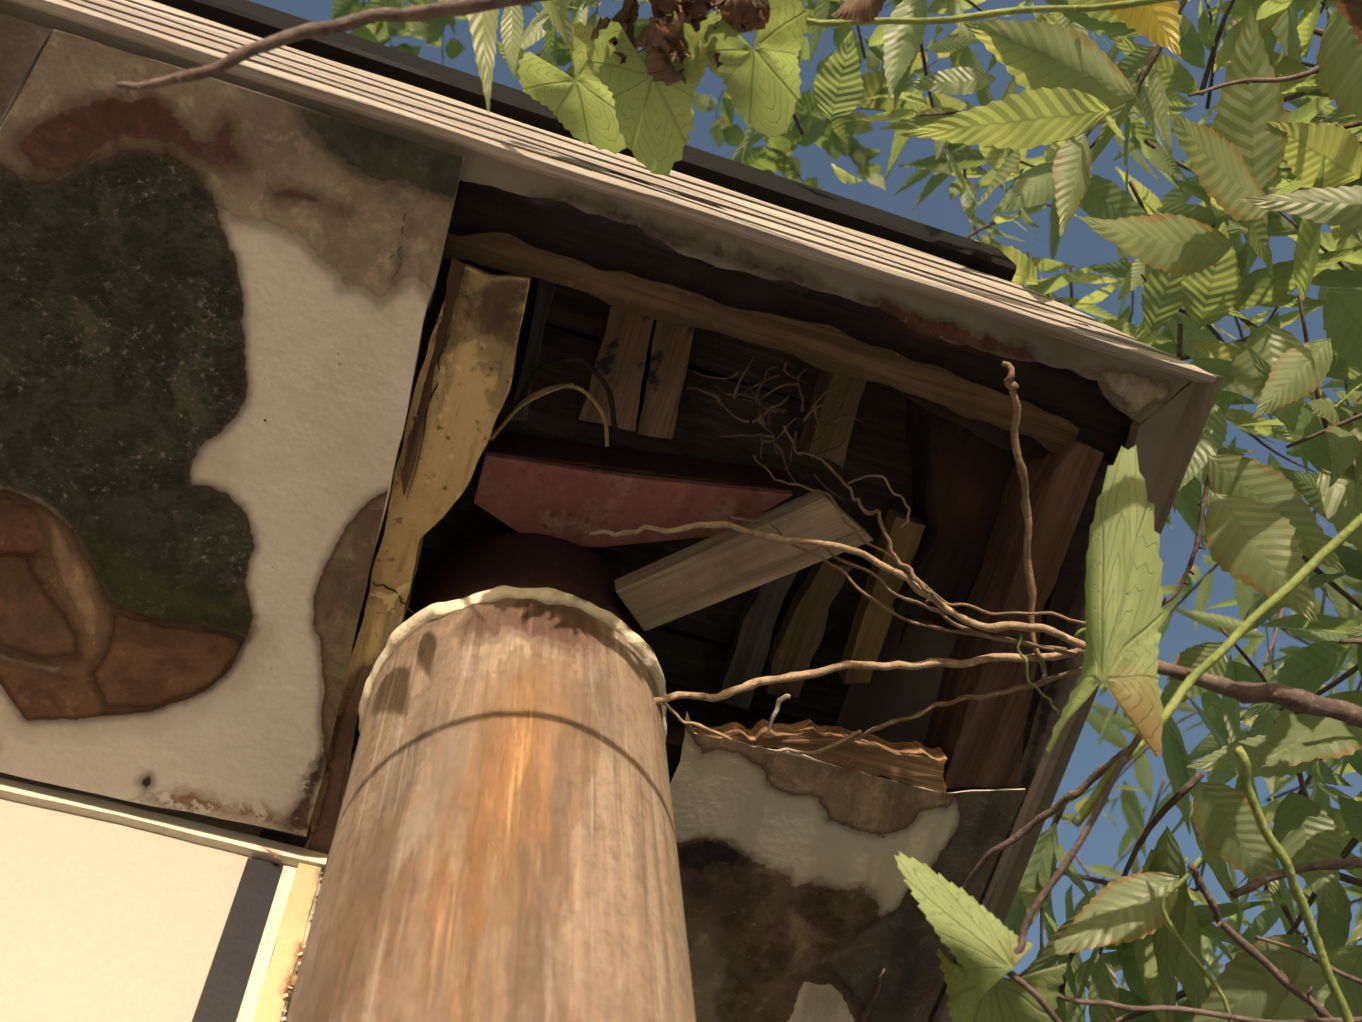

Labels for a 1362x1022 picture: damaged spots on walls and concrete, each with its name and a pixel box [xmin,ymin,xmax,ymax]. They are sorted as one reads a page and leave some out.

damp [0,31,463,721]
corrosion [859,297,1033,360]